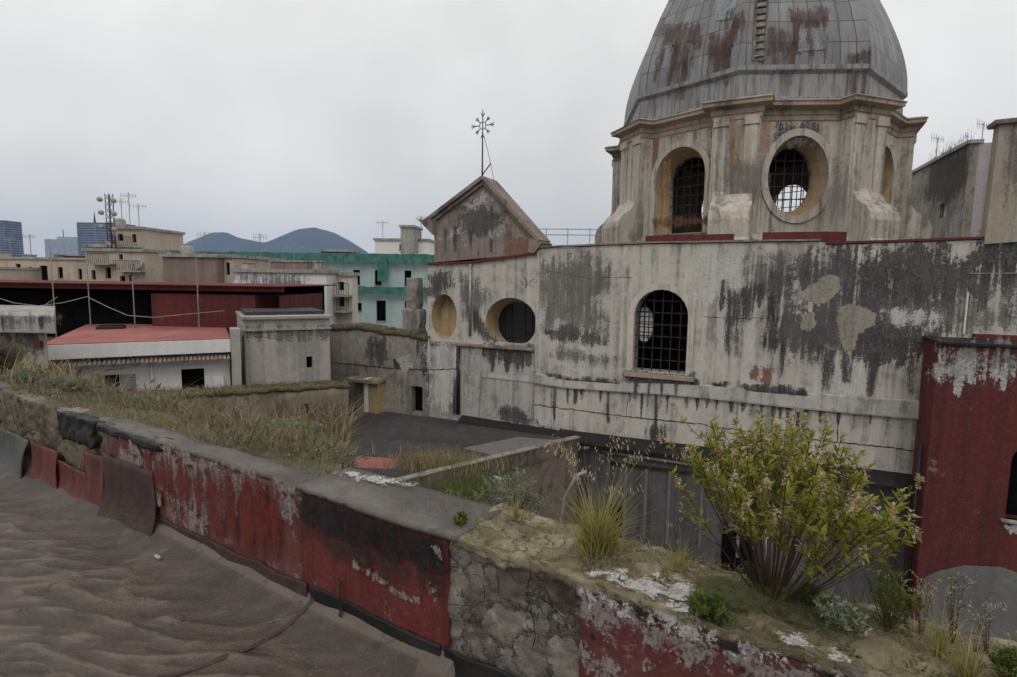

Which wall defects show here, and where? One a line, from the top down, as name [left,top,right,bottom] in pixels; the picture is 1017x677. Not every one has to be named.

corrosion [654,9,745,99]
corrosion [768,6,831,83]
leakage [770,121,819,149]
leakage [924,132,973,210]
leakage [444,202,505,253]
leakage [424,268,535,372]
leakage [540,251,822,442]
leakage [691,230,1017,397]
peeling [926,337,1017,397]
leakage [498,404,538,425]
flaking render [0,388,299,536]
crack [447,571,576,648]